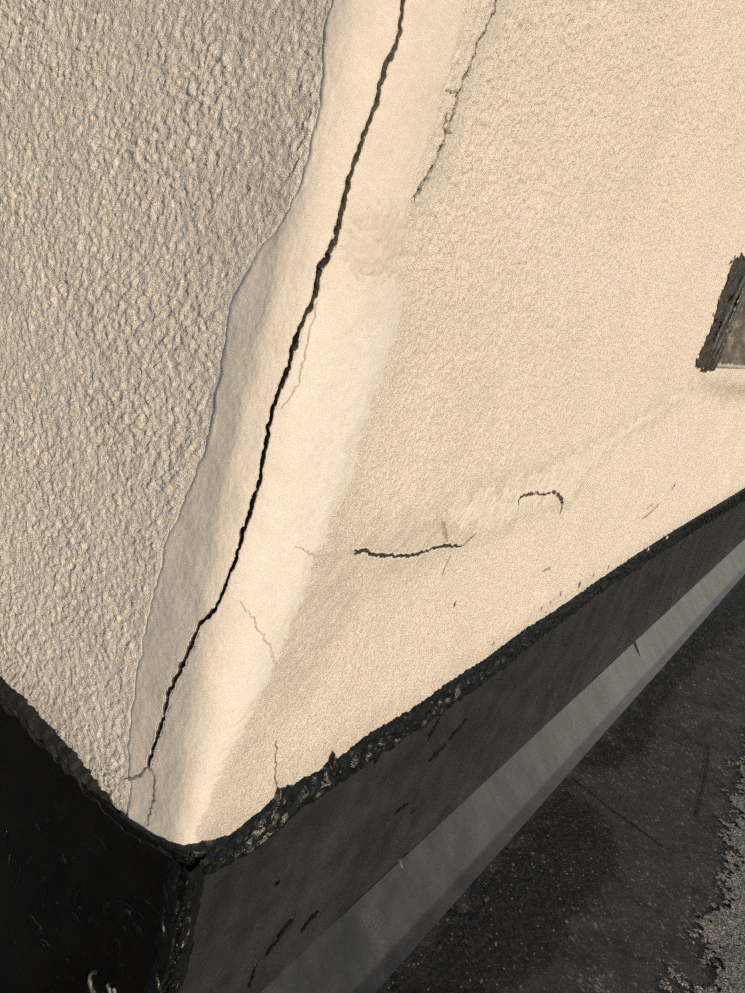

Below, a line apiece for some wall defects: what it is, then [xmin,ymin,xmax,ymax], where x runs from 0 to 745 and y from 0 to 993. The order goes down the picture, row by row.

crack [414,0,497,201]
crack [124,0,407,826]
crack [518,490,564,513]
crack [296,533,477,560]
damp [248,910,319,988]